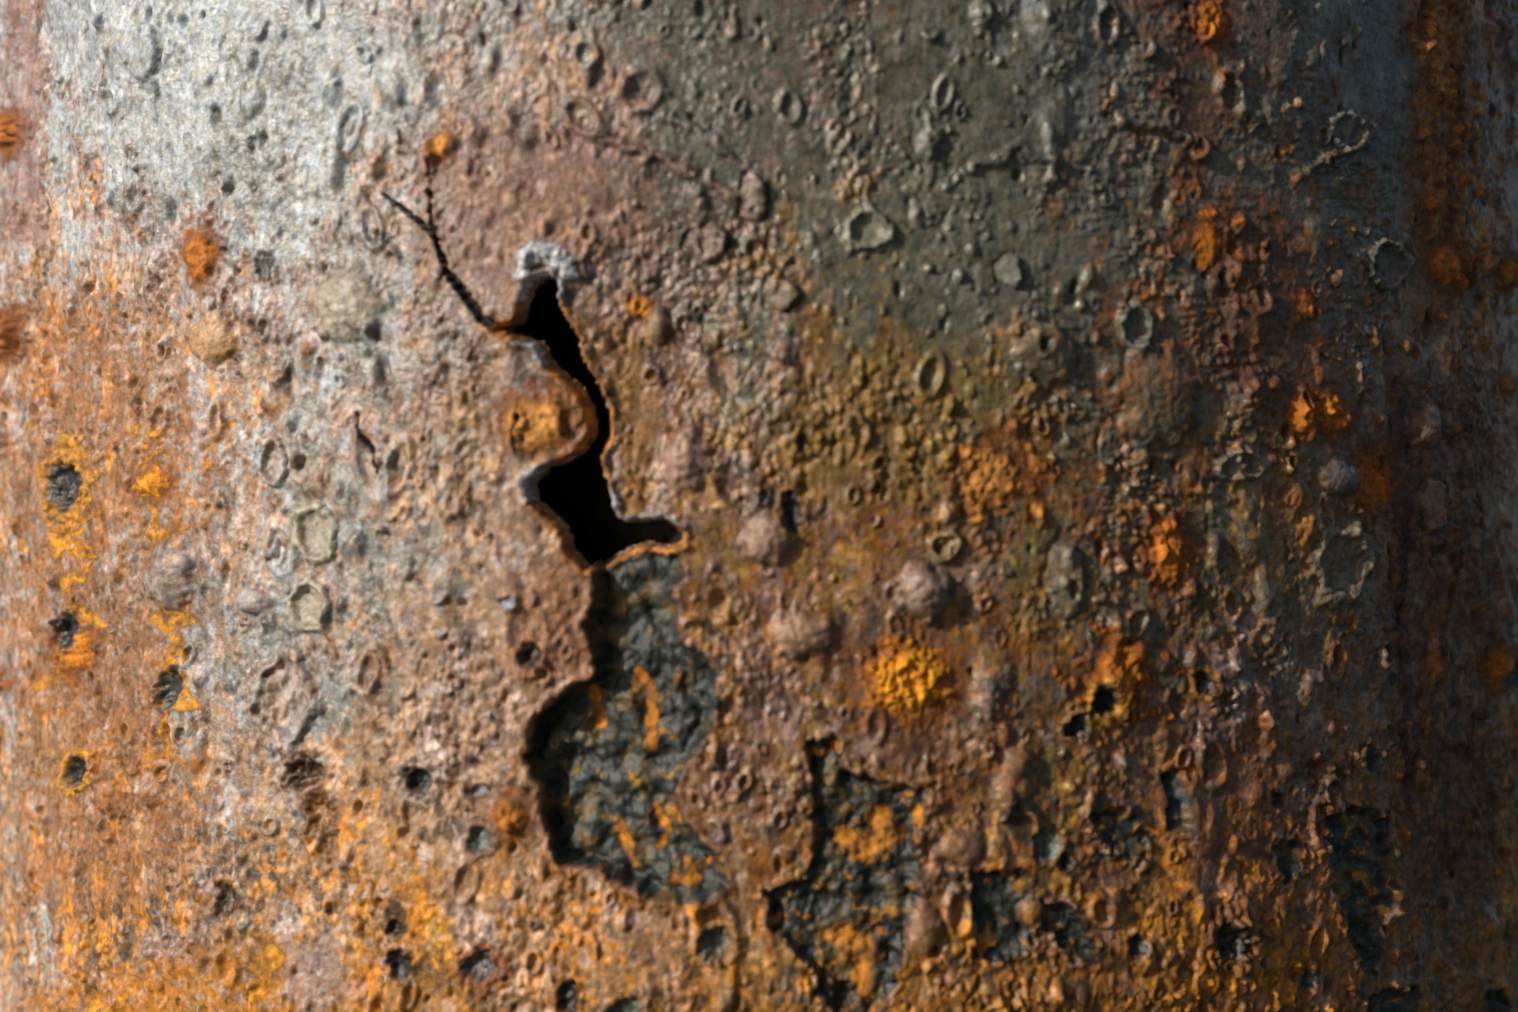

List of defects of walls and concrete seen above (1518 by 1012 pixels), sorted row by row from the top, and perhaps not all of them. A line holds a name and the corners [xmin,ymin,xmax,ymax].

corrosion [0,303,33,366]
corrosion [177,212,221,294]
crack [380,157,512,337]
corrosion [31,453,107,690]
corrosion [123,424,188,547]
crack [510,413,520,456]
corrosion [793,351,1062,531]
corrosion [149,595,199,771]
spalling [524,543,748,969]
corrosion [843,616,970,733]
spalling [762,732,937,1012]
corrosion [27,934,410,1012]